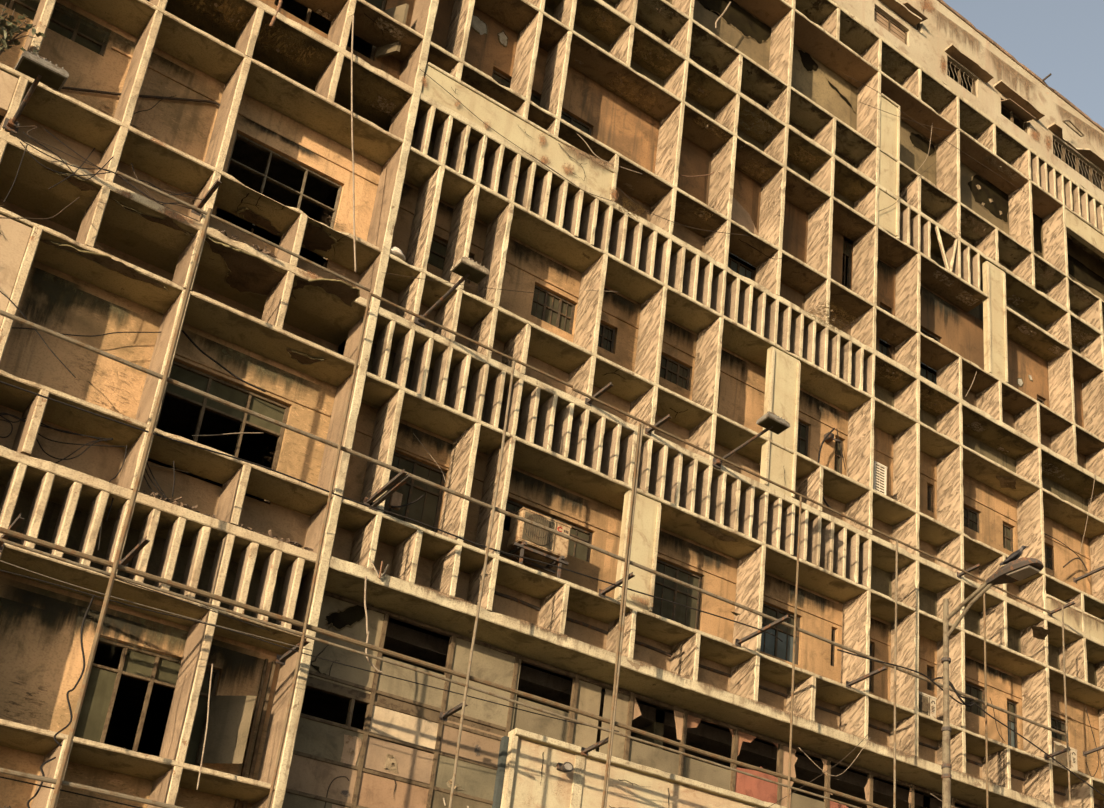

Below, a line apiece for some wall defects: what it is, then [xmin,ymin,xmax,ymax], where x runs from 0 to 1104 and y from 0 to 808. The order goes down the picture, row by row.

peeling [881,47,952,110]
peeling [960,109,988,132]
peeling [985,134,1025,183]
water stain [24,268,130,325]
water stain [511,469,589,510]
water stain [0,583,188,651]